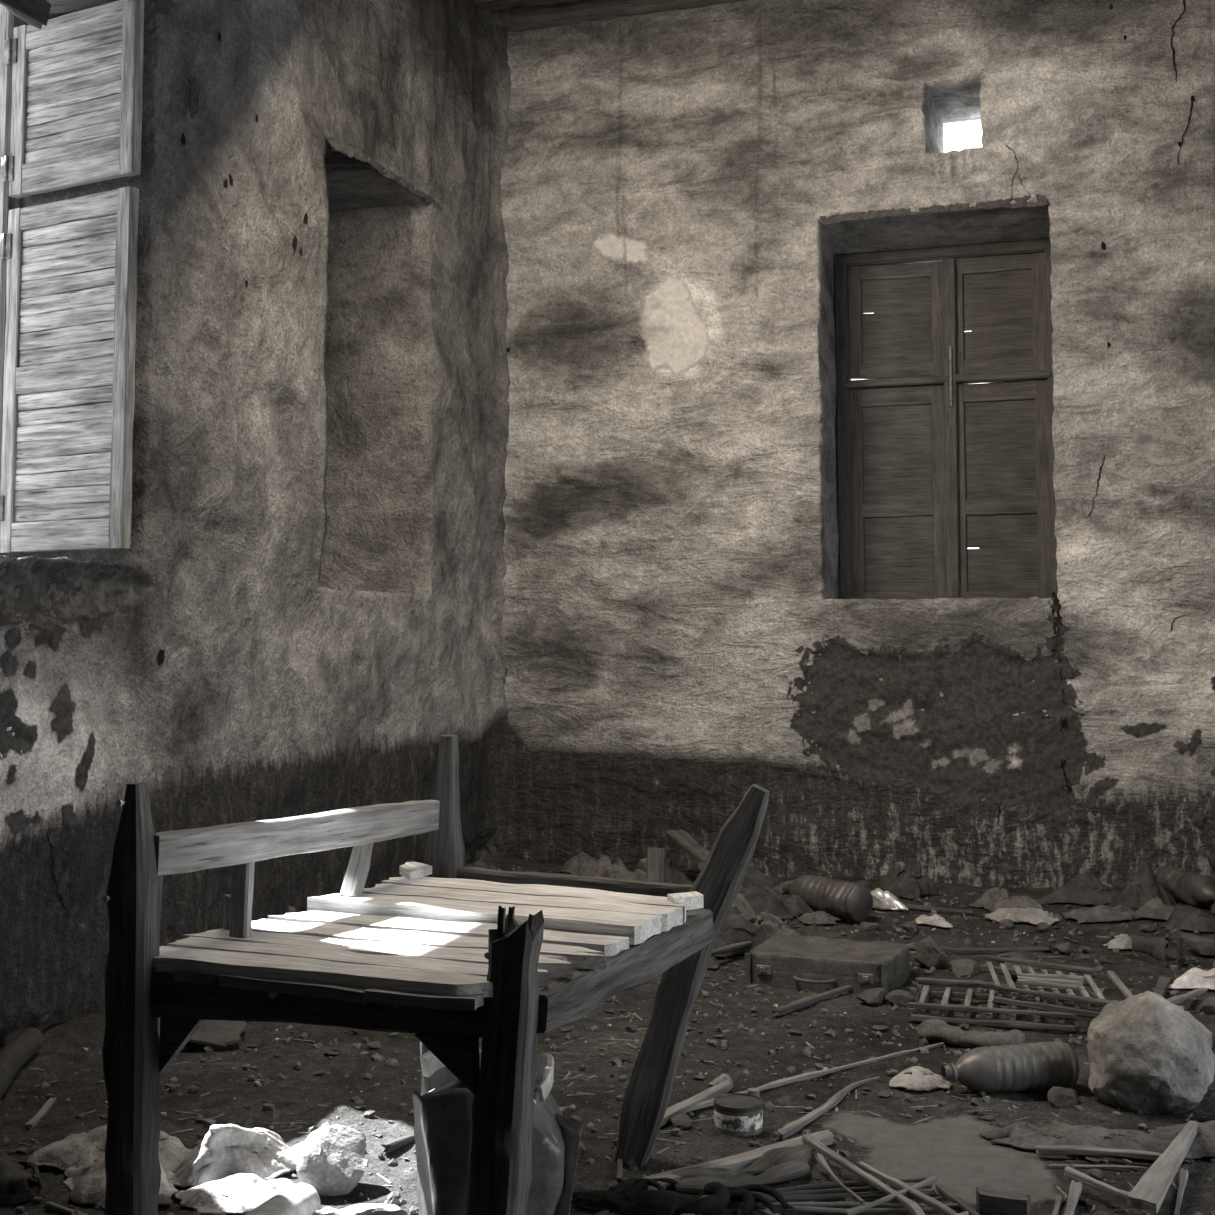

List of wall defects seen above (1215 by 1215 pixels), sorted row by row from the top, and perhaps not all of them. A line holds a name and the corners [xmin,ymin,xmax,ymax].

crack [1171,0,1193,164]
spalling [0,553,162,791]
spalling [786,597,1119,830]
peeling [1121,723,1166,738]
peeling [1173,729,1215,756]
spalling [5,809,41,834]
spalling [62,804,78,830]